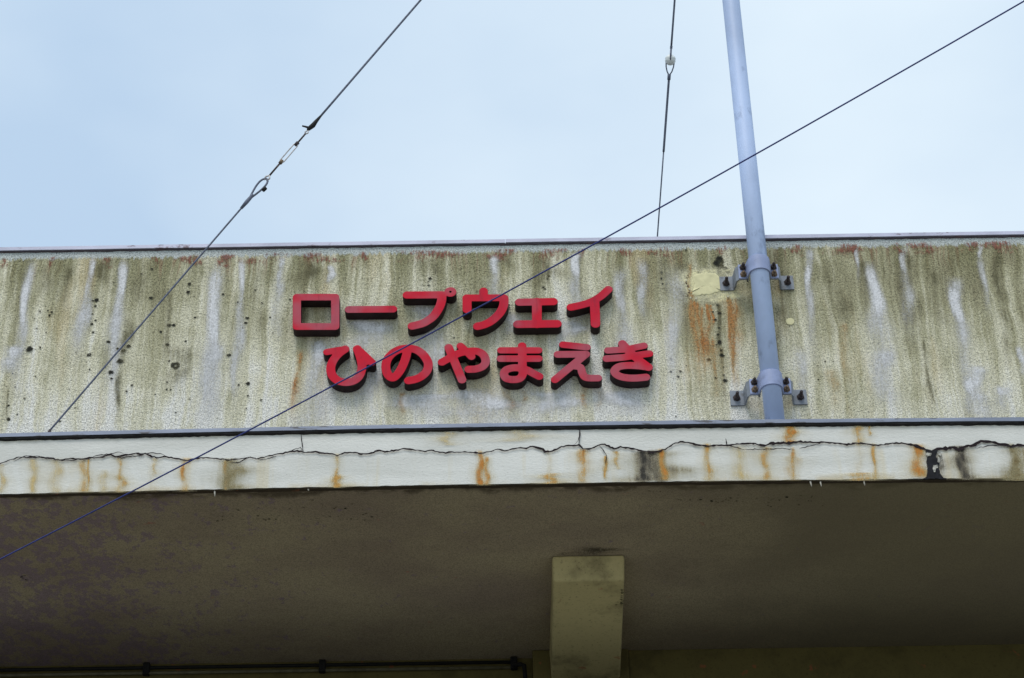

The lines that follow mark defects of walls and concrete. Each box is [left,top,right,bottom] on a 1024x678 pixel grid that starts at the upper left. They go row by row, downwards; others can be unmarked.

damp [3,268,53,421]
damp [75,260,153,404]
damp [352,320,389,343]
corrosion [689,292,716,370]
corrosion [727,297,738,363]
damp [854,250,886,334]
damp [949,282,968,346]
corrosion [476,454,490,485]
crack [0,428,1024,464]
damp [636,450,691,492]
corrosion [912,445,925,476]
damp [955,446,974,479]